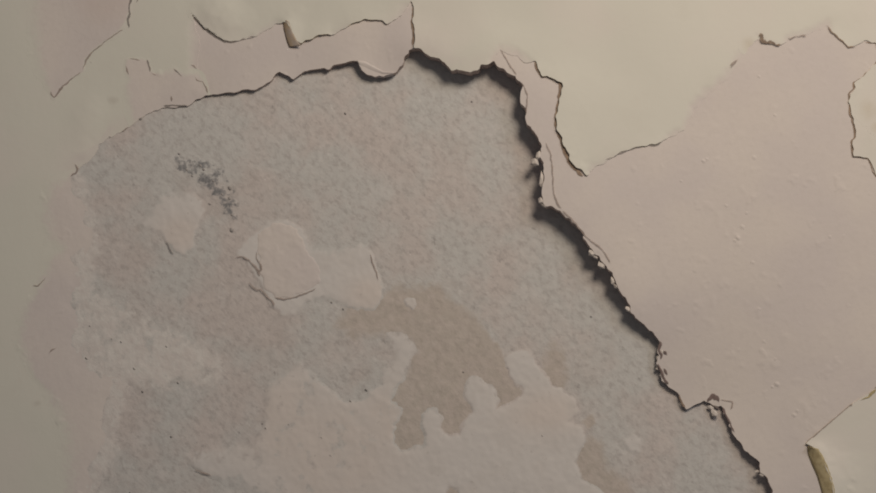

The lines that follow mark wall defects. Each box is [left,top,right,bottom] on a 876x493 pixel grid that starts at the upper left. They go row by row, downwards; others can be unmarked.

crack [51,0,138,98]
crack [194,18,255,43]
crack [409,6,417,45]
crack [759,33,806,46]
crack [828,27,876,176]
spalling [79,2,771,493]
peeling [490,26,876,493]
crack [808,389,876,441]